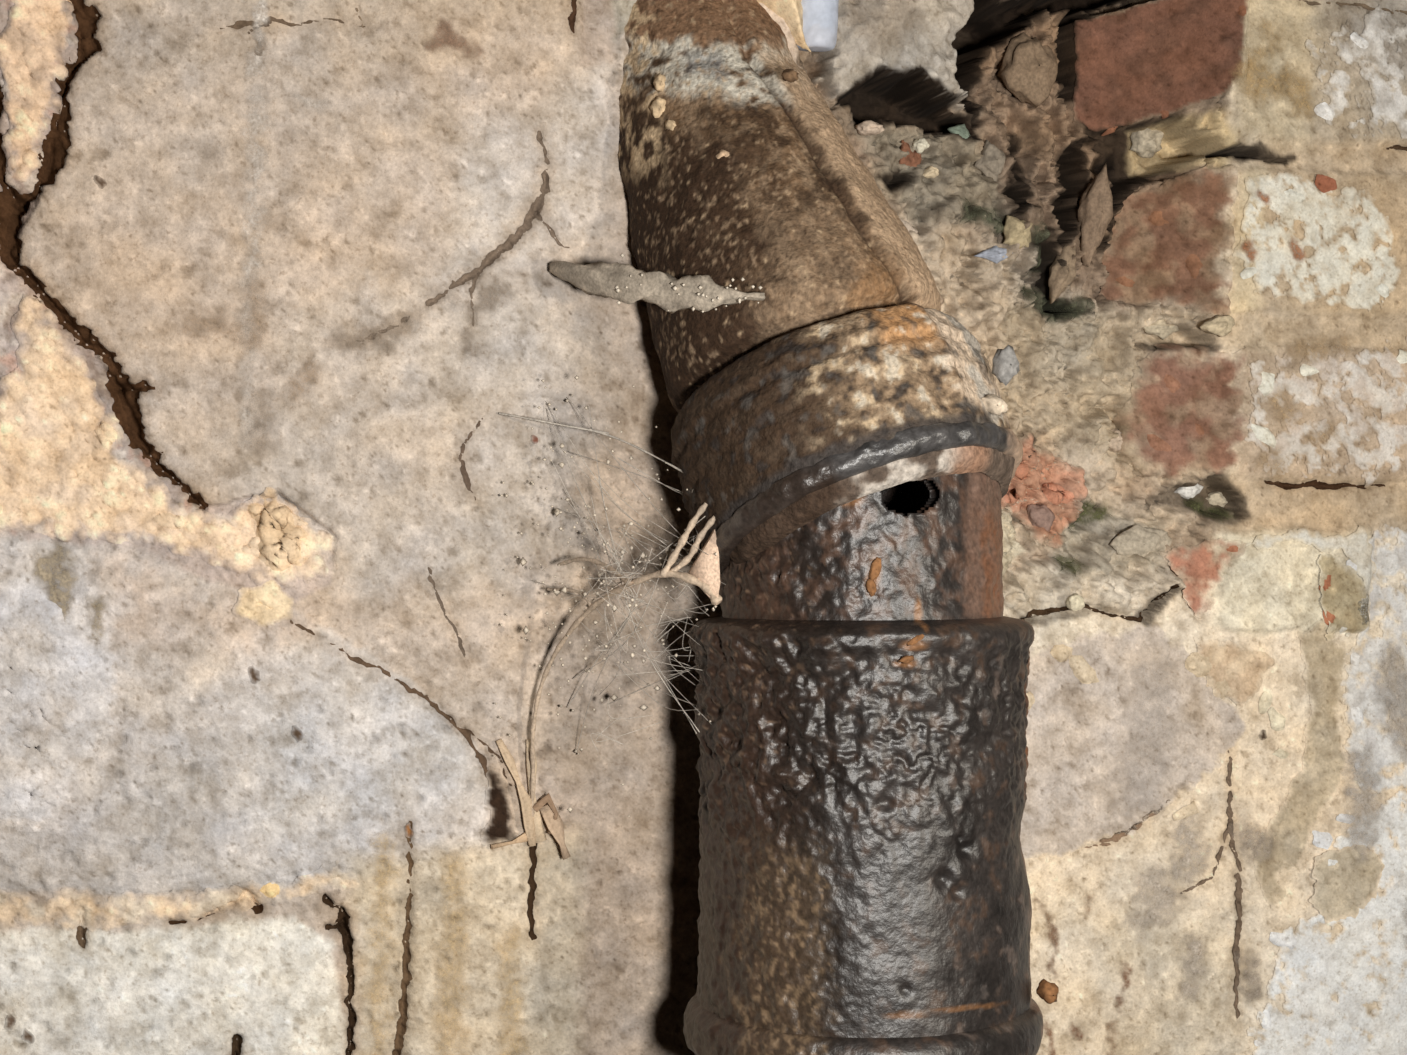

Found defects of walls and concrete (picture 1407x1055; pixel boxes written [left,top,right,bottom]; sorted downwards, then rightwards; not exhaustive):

spalling [1072,0,1249,136]
crack [0,0,209,510]
spalling [0,293,338,627]
spalling [1001,432,1088,549]
crack [1265,480,1385,490]
rust [866,557,882,597]
crack [1021,584,1180,622]
crack [290,620,512,786]
crack [322,894,357,1055]
crack [392,821,414,1055]
crack [1172,750,1243,1019]